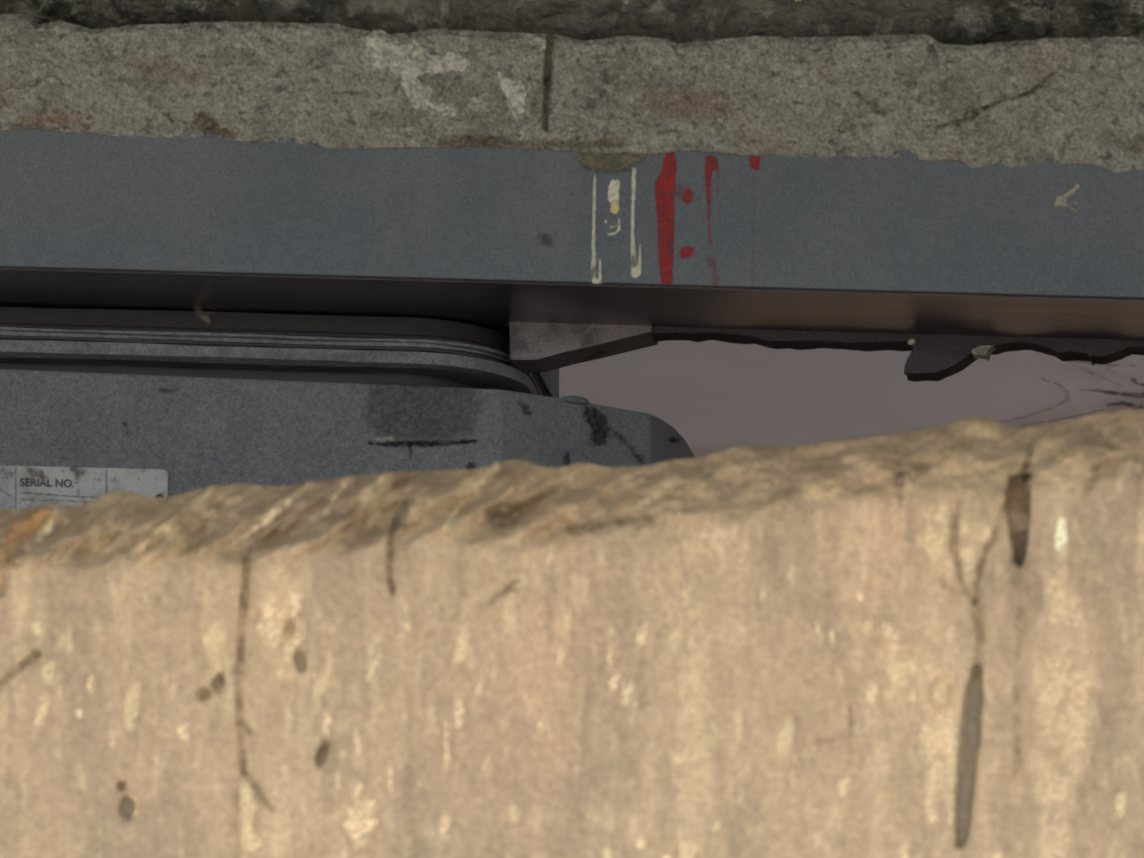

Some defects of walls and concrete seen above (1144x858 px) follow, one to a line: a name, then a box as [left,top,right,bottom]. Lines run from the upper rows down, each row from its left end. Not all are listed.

crack [937,73,1053,127]
rust [0,508,53,597]
crack [240,558,249,610]
crack [974,534,995,651]
crack [236,641,244,672]